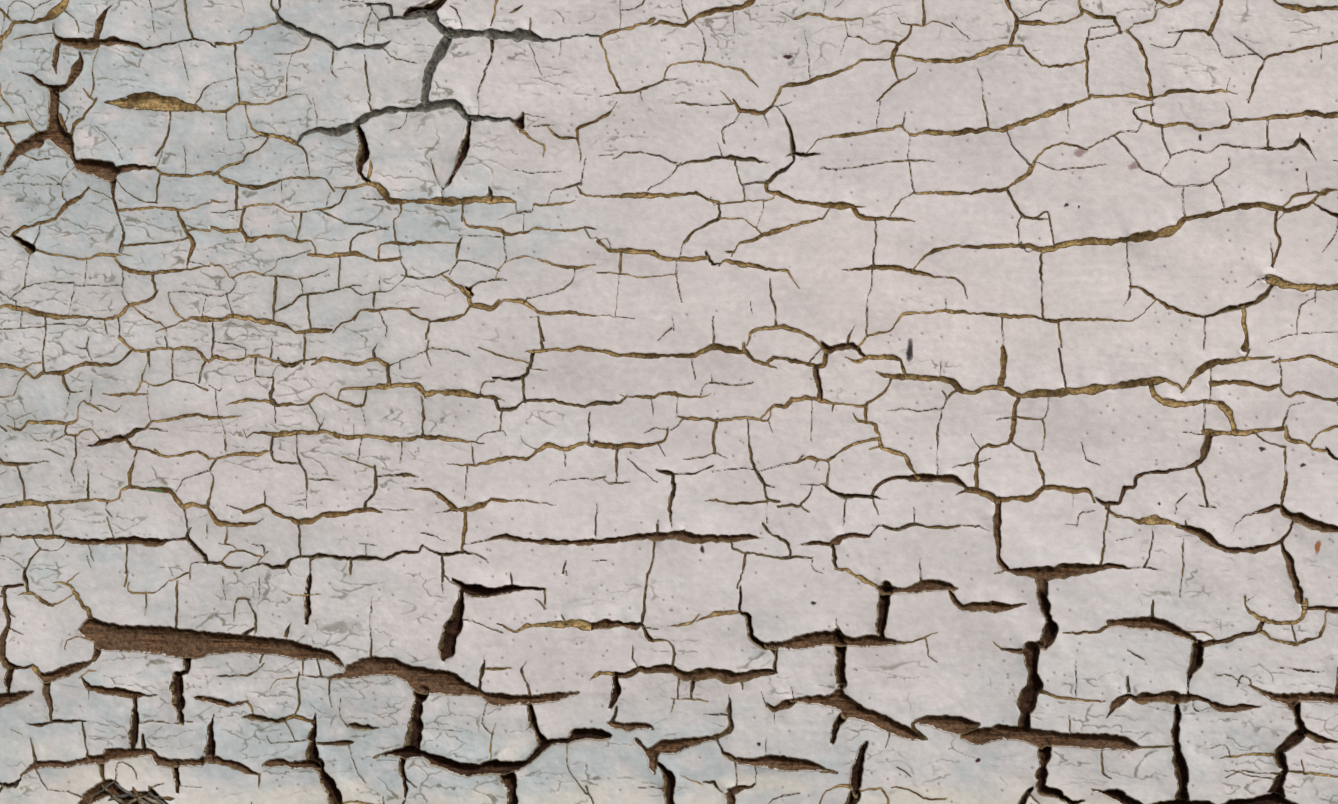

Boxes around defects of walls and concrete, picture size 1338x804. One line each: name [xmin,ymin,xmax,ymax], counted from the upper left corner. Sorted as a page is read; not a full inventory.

crack [0,0,1338,526]
crack [27,658,260,804]
crack [0,380,556,693]
crack [270,671,462,747]
peeling [0,578,947,804]
crack [471,465,823,713]
crack [681,765,800,804]
crack [797,514,990,568]
crack [948,590,1027,614]
peeling [761,558,1338,804]
crack [992,423,1338,729]
crack [1105,676,1260,800]